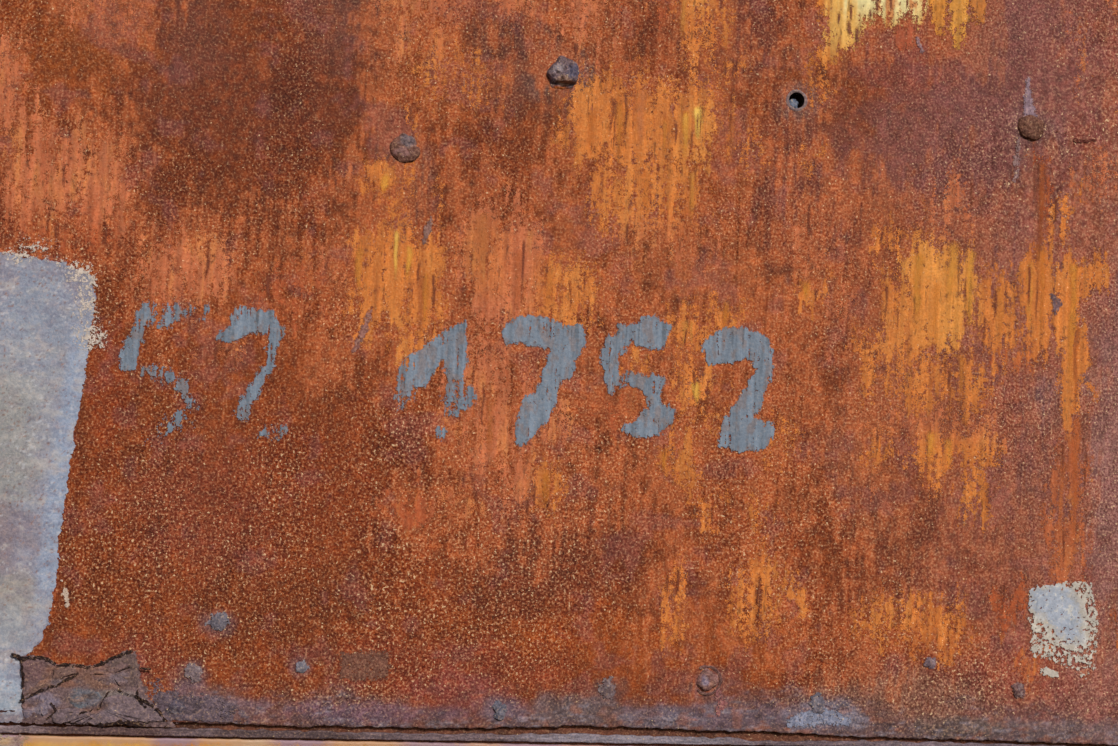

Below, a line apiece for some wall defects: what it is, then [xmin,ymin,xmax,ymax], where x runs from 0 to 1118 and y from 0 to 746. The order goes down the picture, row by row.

rust [787,57,840,117]
rust [0,0,811,665]
rust [780,143,1118,592]
rust [843,574,979,677]
rust [984,569,1029,644]
rust [11,650,249,727]